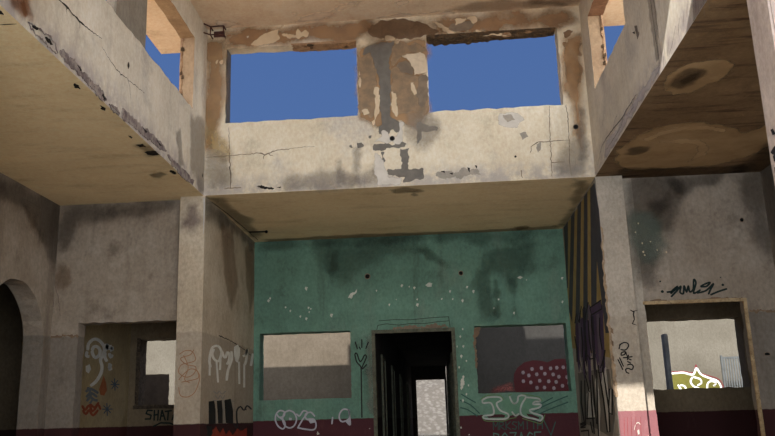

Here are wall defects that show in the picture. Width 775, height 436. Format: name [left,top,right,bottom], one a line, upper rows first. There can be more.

crack [59,0,144,95]
spalling [28,22,203,185]
flaking render [291,18,583,186]
water stain [605,40,768,170]
crack [205,129,315,240]